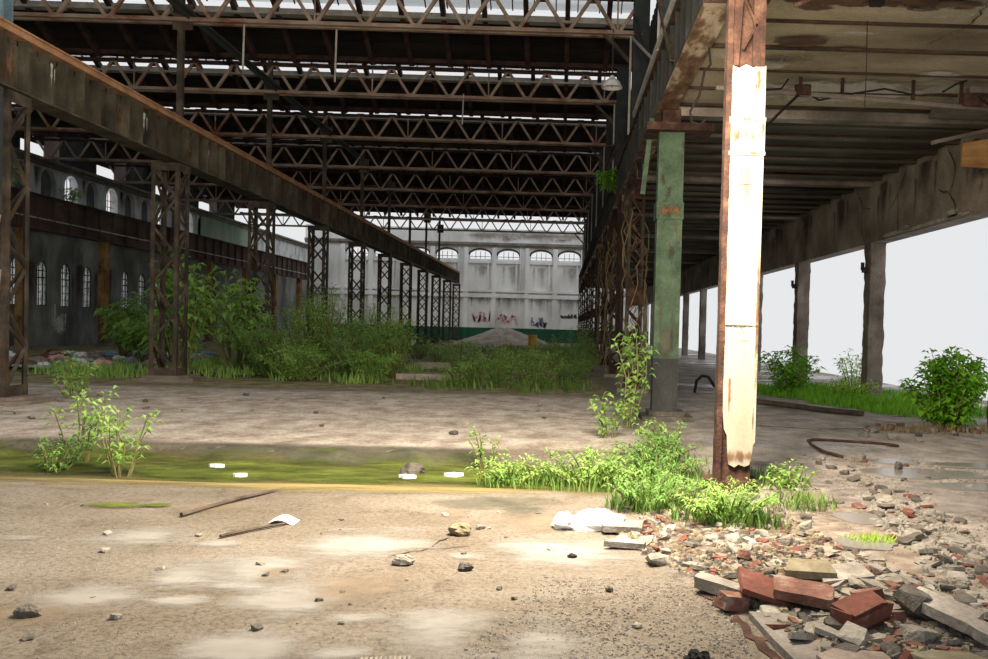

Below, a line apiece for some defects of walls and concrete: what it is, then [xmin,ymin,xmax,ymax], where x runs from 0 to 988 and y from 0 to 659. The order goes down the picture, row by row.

rust [728,452,751,461]